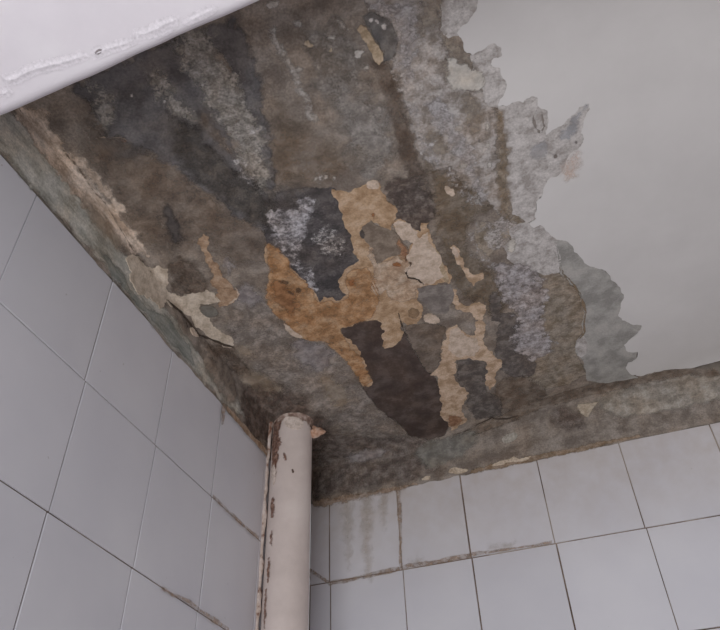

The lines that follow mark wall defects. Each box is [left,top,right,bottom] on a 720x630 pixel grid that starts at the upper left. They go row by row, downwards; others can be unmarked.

crack [66,154,147,267]
peeling [0,0,720,504]
leakage [0,12,720,501]
crack [168,300,234,348]
corrosion [221,403,304,485]